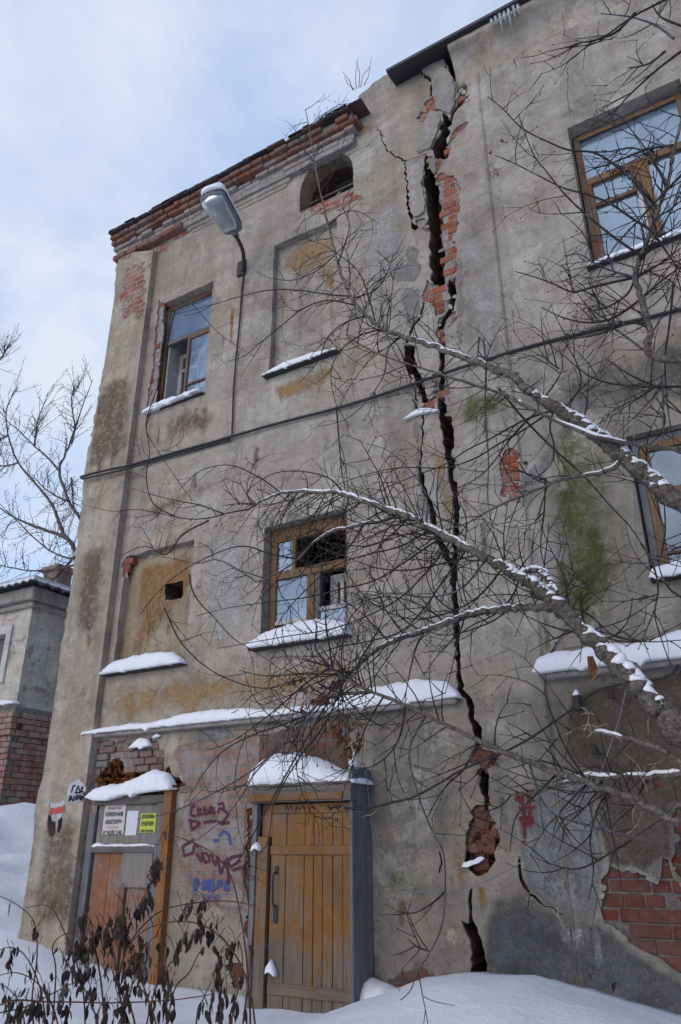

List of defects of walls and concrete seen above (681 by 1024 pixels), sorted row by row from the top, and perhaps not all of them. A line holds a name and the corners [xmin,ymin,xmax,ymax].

flaking render [297,191,362,219]
flaking render [119,230,188,319]
flaking render [148,301,170,406]
water stain [91,380,126,470]
crack [377,62,489,810]
flaking render [499,428,567,506]
flaking render [651,672,681,710]
flaking render [94,717,348,936]
flaking render [487,678,681,1014]
crack [463,889,487,972]